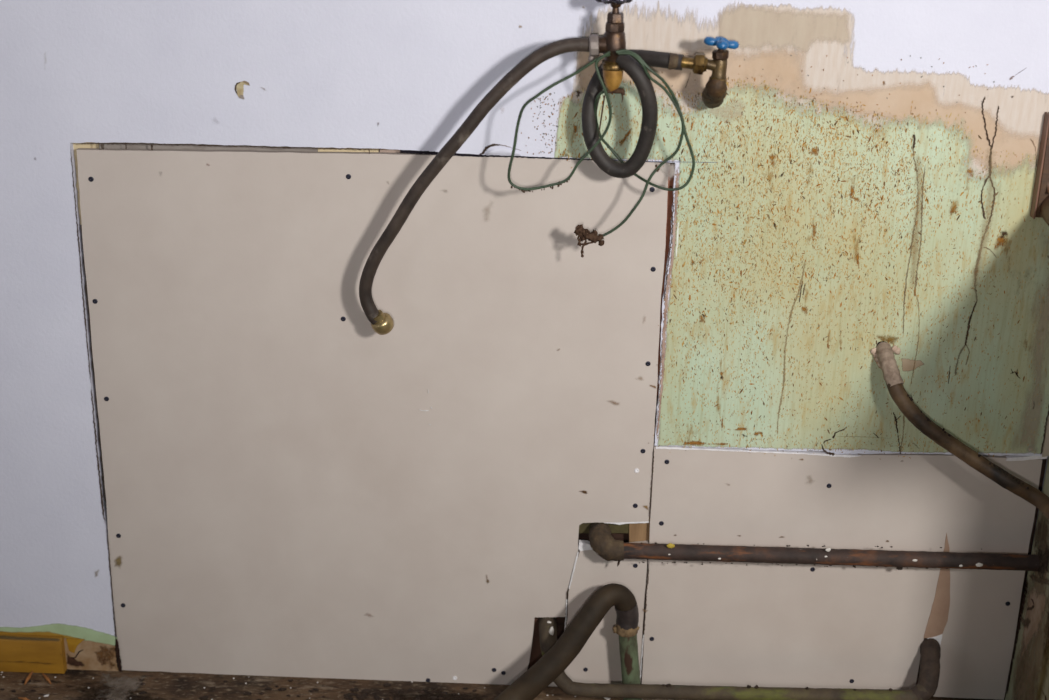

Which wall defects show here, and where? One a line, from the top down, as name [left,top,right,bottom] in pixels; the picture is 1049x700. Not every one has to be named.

corrosion [521,75,592,168]
peeling [554,51,605,159]
corrosion [597,80,642,162]
peeling [585,1,1049,491]
corrosion [647,55,1049,460]
crack [948,98,999,384]
spalling [599,521,649,543]
spalling [1028,507,1038,554]
spalling [556,567,574,640]